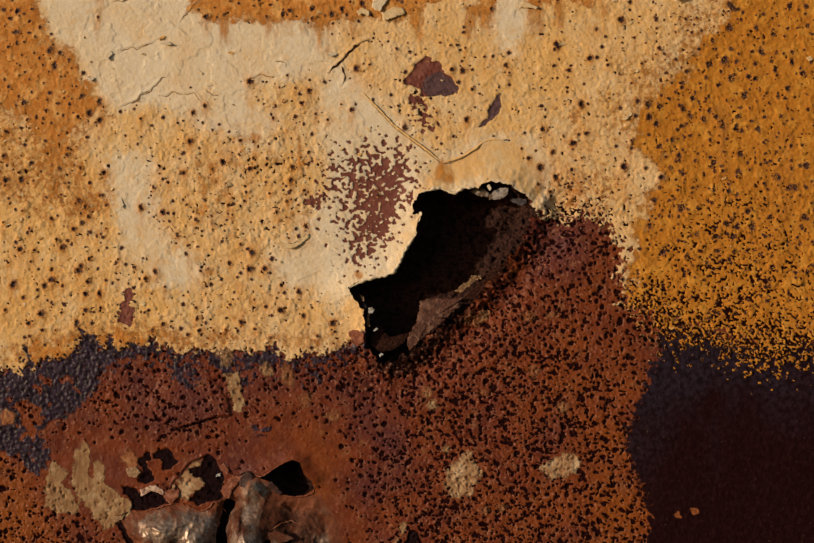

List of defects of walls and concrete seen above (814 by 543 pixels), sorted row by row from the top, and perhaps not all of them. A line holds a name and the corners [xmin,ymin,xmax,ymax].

corrosion [186,0,441,43]
spalling [566,0,714,83]
corrosion [0,0,111,218]
spalling [0,0,153,203]
crack [123,77,218,106]
crack [329,40,506,164]
peeling [464,84,501,127]
corrosion [607,0,814,391]
corrosion [0,322,236,365]